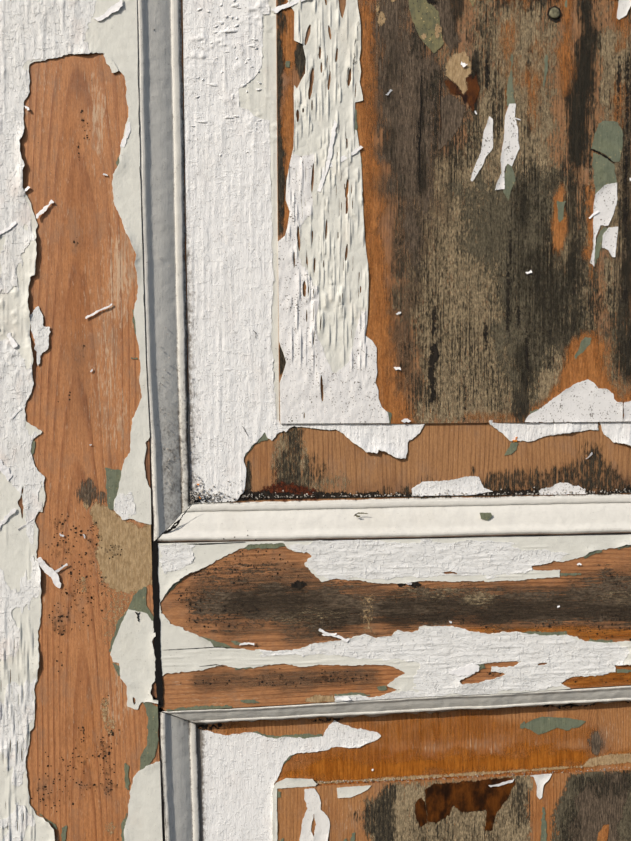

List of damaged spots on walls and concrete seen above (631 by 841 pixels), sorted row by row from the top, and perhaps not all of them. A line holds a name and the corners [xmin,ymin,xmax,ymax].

peeling [242,0,631,500]
peeling [20,53,405,841]
mould [272,427,324,494]
damp [475,443,630,498]
peeling [160,543,631,651]
damp [174,548,631,643]
peeling [448,661,521,684]
peeling [561,665,631,688]
peeling [197,702,631,841]